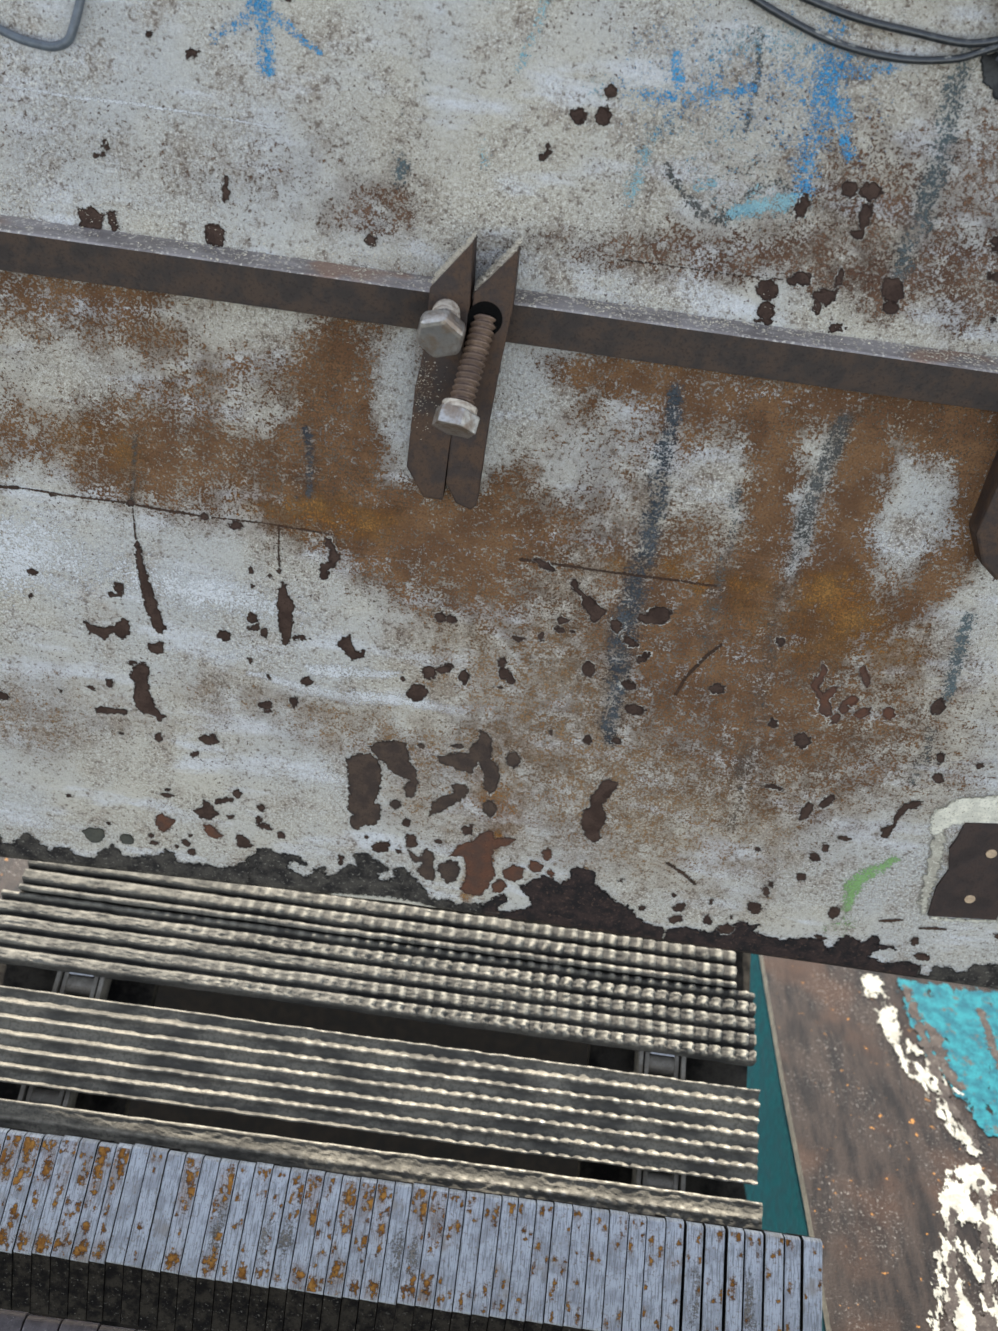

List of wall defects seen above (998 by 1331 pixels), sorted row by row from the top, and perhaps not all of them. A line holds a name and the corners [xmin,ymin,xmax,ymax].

peeling [76,205,120,232]
peeling [204,223,225,247]
peeling [791,192,812,219]
peeling [841,179,885,240]
crack [618,259,783,280]
peeling [753,267,847,333]
peeling [880,276,905,317]
corrosion [0,270,998,921]
crack [519,558,717,587]
peeling [83,541,167,742]
peeling [810,661,896,725]
peeling [0,729,998,1331]